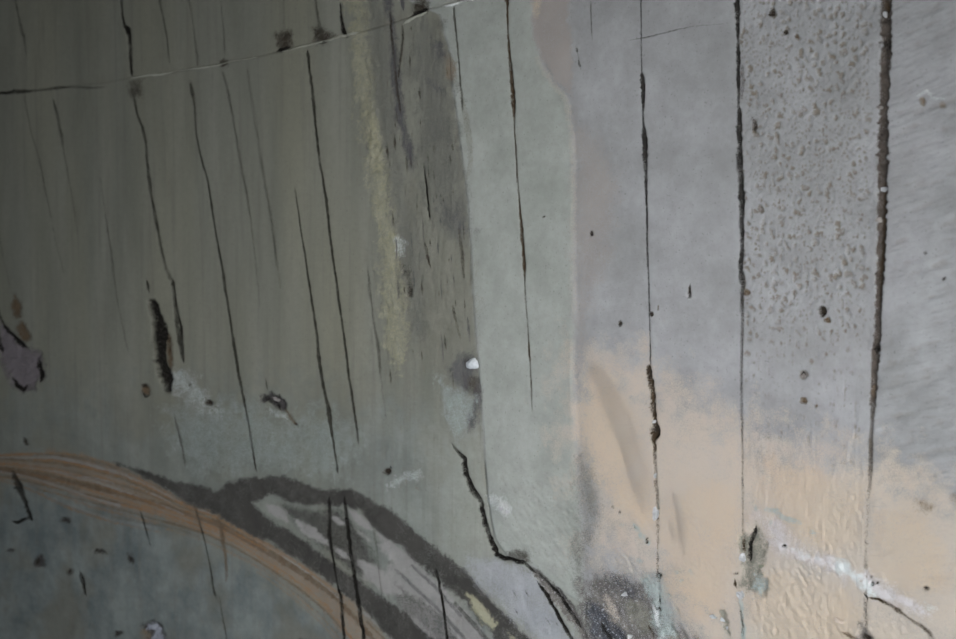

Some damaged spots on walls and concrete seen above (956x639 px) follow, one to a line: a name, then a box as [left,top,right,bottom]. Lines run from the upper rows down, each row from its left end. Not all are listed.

crack [0,86,101,95]
crack [120,1,184,363]
crack [505,0,533,410]
spalling [0,296,48,397]
crack [452,444,536,573]
damp [641,570,681,639]
spalling [733,521,769,599]